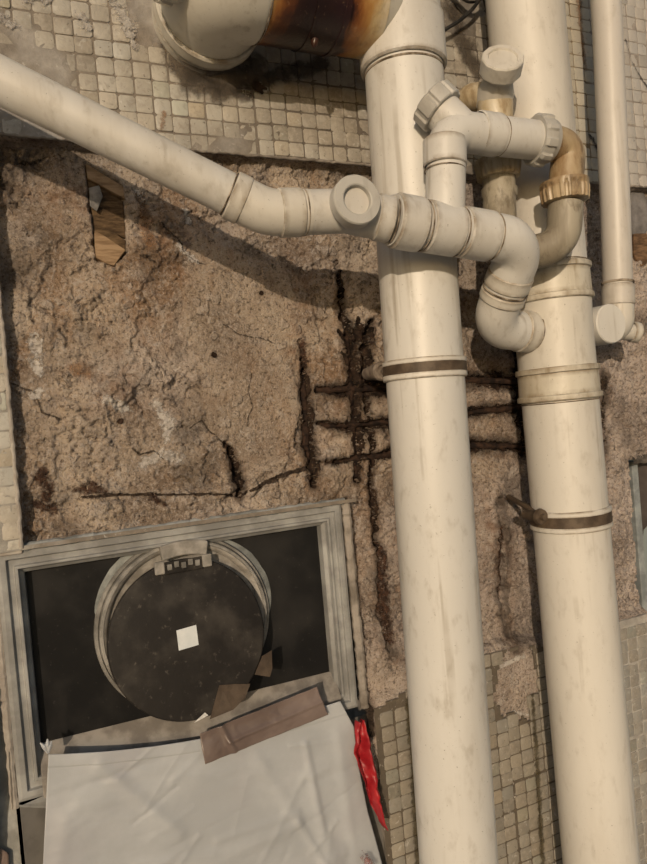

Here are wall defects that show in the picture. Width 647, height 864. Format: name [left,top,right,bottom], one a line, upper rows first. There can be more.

damp [161,44,330,101]
spalling [465,174,483,208]
spalling [583,184,602,308]
spalling [0,136,407,779]
corrosion [297,337,391,477]
corrosion [467,403,522,415]
corrosion [470,442,522,450]
spalling [457,258,543,721]
spalling [596,255,647,620]
corrosion [372,540,394,645]
corrosion [497,525,509,594]